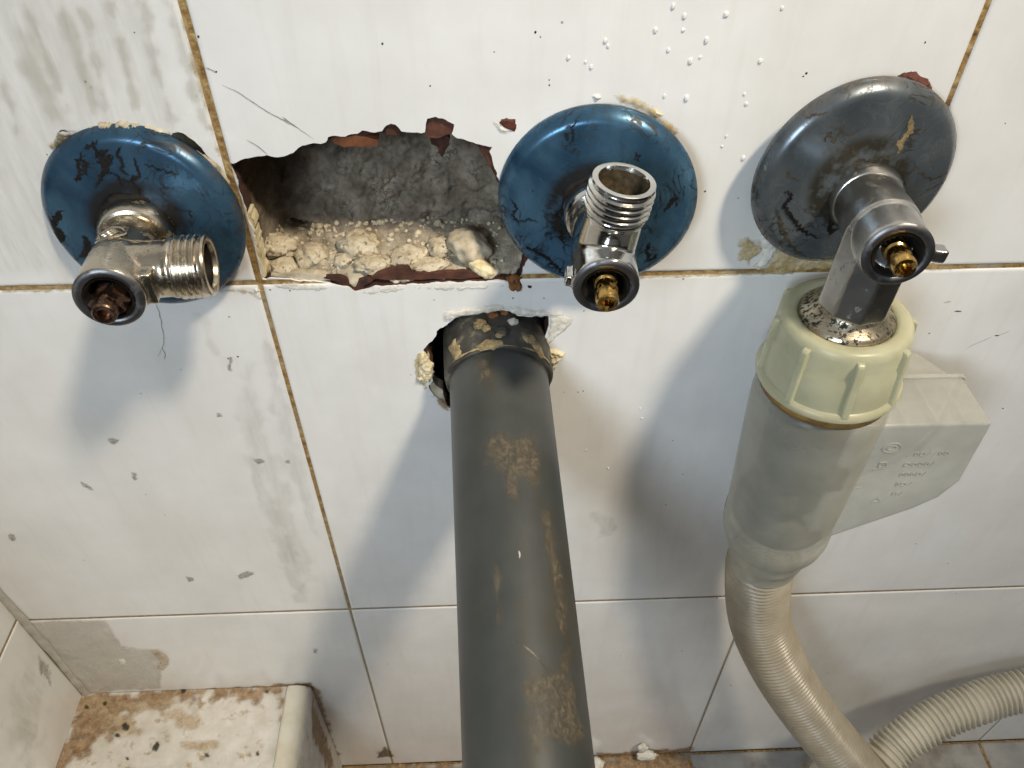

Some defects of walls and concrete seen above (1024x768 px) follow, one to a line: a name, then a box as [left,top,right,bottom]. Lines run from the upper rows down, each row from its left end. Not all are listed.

crack [205,67,313,139]
spalling [240,117,523,294]
spalling [415,305,572,410]